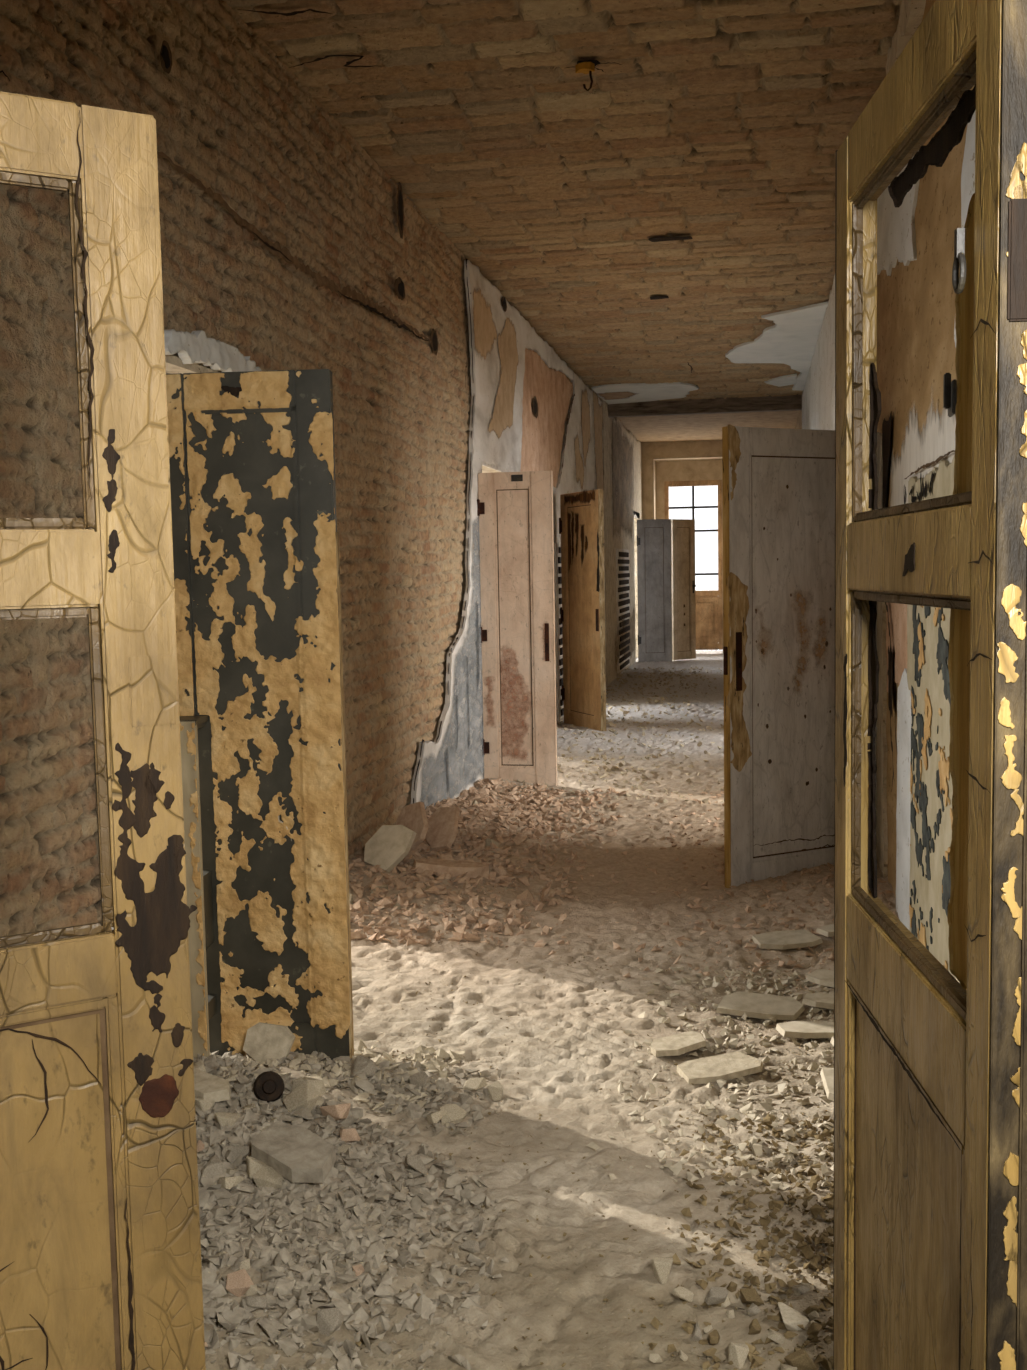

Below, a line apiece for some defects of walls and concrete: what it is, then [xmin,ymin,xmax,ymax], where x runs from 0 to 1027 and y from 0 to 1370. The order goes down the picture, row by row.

spalling [395,277,405,300]
peeling [725,275,835,430]
peeling [102,429,120,512]
peeling [107,530,120,573]
peeling [411,260,699,808]
peeling [112,329,350,1077]
peeling [127,1053,154,1086]